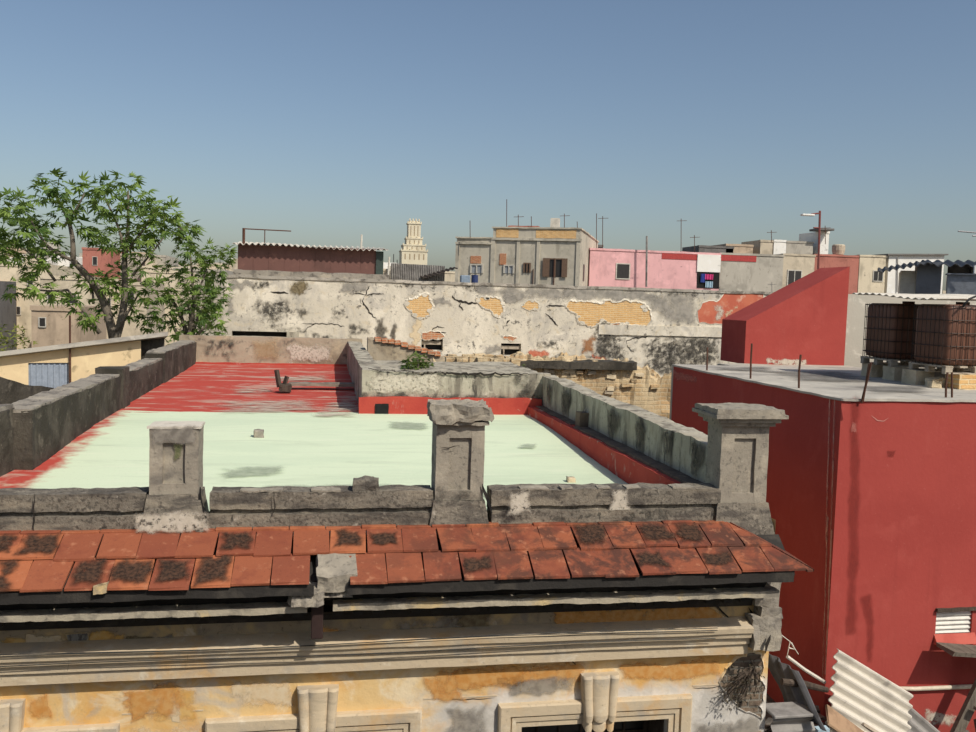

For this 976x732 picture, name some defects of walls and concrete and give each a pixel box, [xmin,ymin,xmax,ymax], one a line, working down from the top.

crack [354,286,383,318]
spalling [403,291,435,345]
crack [452,295,477,310]
spalling [475,295,506,319]
spalling [564,298,653,329]
peeling [696,293,764,325]
leakage [590,322,623,360]
leakage [642,336,922,392]
leakage [607,410,619,435]
leakage [635,420,644,447]
spalling [718,582,783,719]